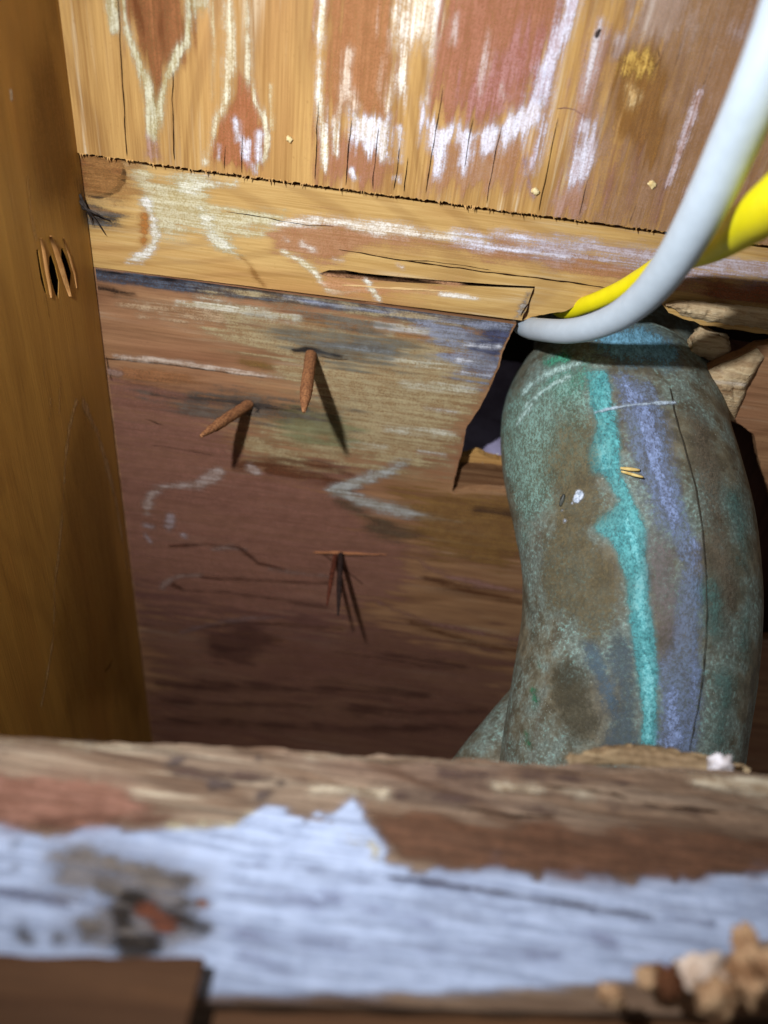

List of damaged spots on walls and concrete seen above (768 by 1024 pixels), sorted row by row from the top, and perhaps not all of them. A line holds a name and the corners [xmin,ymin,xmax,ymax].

crack [486,124,503,204]
crack [539,107,596,208]
crack [226,211,328,226]
crack [338,249,601,321]
leakage [59,0,768,796]
leakage [168,757,282,801]
leakage [311,785,406,799]
leakage [371,794,768,882]
peeling [0,800,768,996]